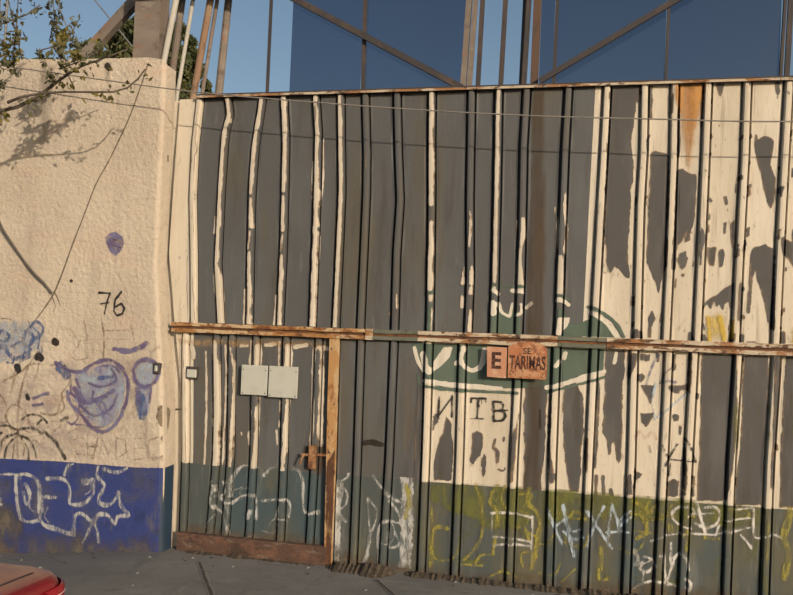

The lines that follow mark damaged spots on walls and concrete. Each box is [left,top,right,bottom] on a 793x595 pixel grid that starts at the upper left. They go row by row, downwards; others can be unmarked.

peeling [242,96,263,324]
peeling [273,96,288,325]
peeling [309,95,325,327]
peeling [333,94,343,327]
peeling [428,91,436,206]
peeling [492,89,501,290]
corrosion [676,83,703,149]
peeling [590,83,793,344]
corrosion [307,447,335,565]
peeling [470,387,555,491]
peeling [563,350,660,496]
peeling [666,354,793,508]